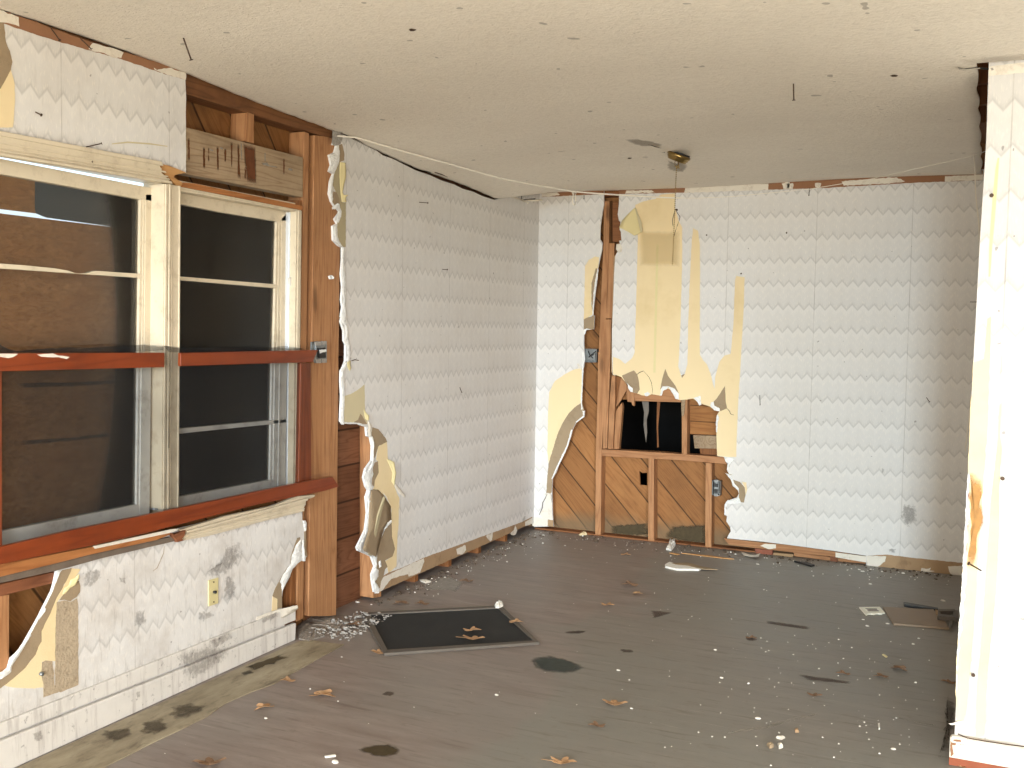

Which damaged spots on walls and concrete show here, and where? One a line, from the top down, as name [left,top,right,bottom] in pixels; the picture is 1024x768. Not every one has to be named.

spalling [583,256,599,335]
spalling [328,130,405,605]
spalling [546,352,585,494]
spalling [611,349,701,454]
spalling [694,387,733,432]
spalling [724,457,747,515]
water stain [968,478,983,562]
spalling [272,521,308,611]
spalling [0,568,81,698]